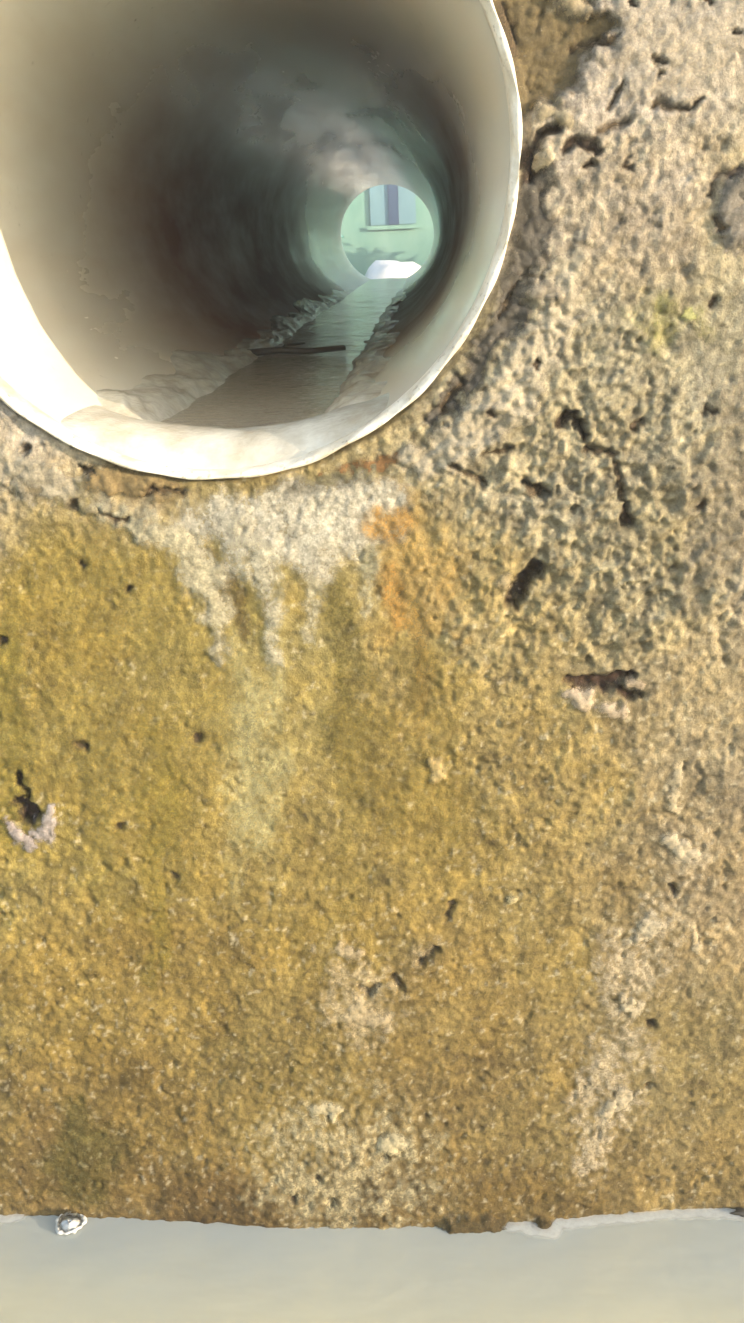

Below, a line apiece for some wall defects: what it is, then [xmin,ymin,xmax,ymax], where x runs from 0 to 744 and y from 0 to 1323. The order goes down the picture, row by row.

corrosion [361,484,463,744]
peeling [497,573,514,590]
leakage [97,472,407,847]
spalling [561,670,646,719]
spalling [4,771,57,853]